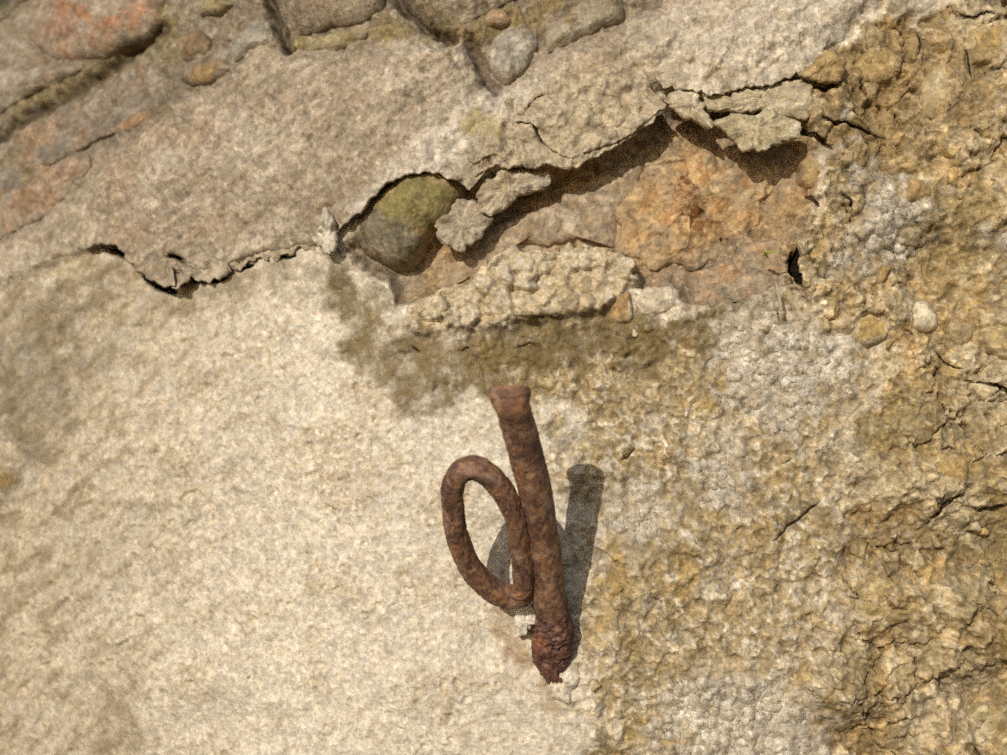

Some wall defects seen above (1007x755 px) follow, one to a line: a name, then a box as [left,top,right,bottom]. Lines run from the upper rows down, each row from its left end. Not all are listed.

crack [812,83,835,91]
crack [524,94,544,143]
crack [800,115,885,149]
spalling [312,49,847,313]
crack [805,191,852,210]
crack [106,248,125,256]
crack [142,254,253,293]
crack [788,247,803,285]
crack [935,351,1007,394]
crack [932,494,1007,518]